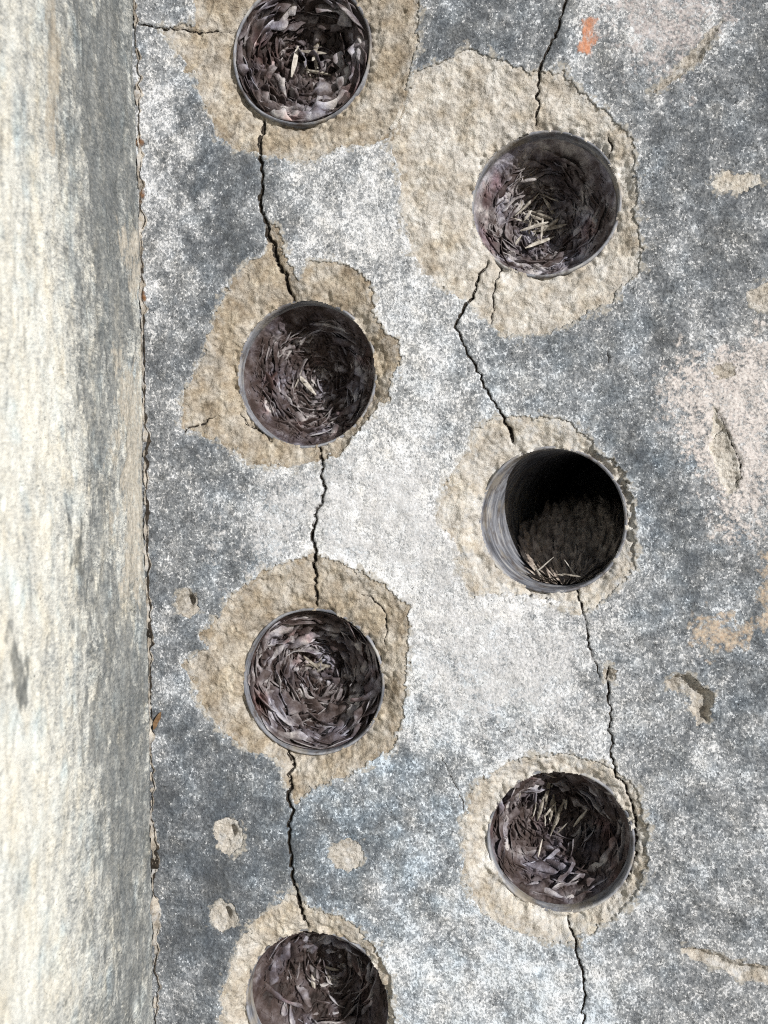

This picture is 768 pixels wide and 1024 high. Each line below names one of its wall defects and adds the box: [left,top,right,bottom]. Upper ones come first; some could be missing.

crack [535,0,567,124]
crack [257,121,295,300]
crack [133,2,232,1022]
crack [185,414,272,442]
crack [310,447,327,605]
crack [454,263,514,442]
crack [577,590,639,881]
spalling [664,671,717,726]
crack [286,750,309,924]
crack [567,917,587,1024]